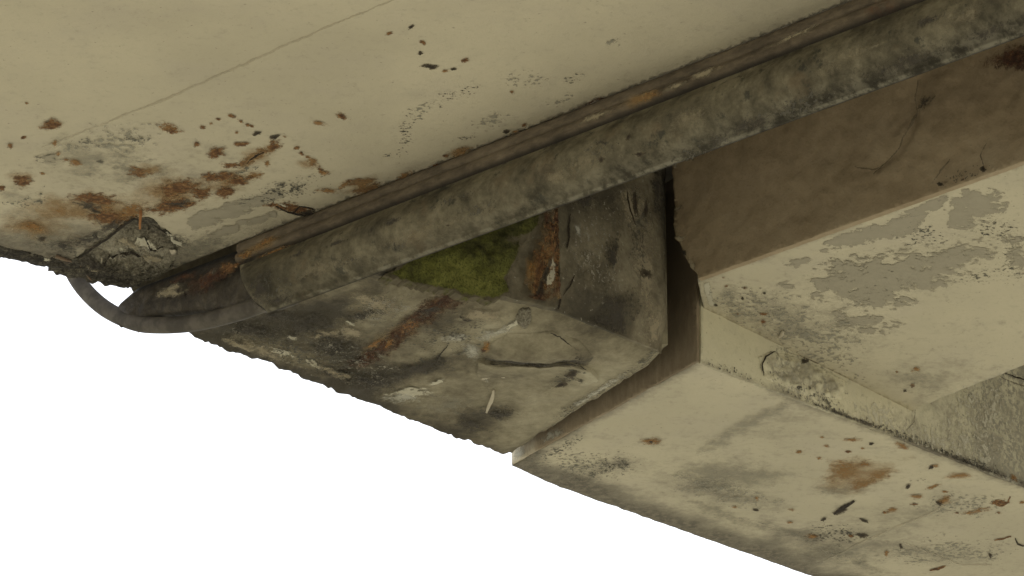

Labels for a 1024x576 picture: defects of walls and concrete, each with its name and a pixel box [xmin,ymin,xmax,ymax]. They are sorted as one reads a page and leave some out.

corrosion [0,172,45,191]
corrosion [39,117,82,166]
corrosion [67,114,380,229]
spalling [0,215,182,289]
peeling [785,165,1024,336]
damp [231,268,518,389]
corrosion [350,295,462,367]
corrosion [830,438,890,489]
damp [786,391,1001,476]